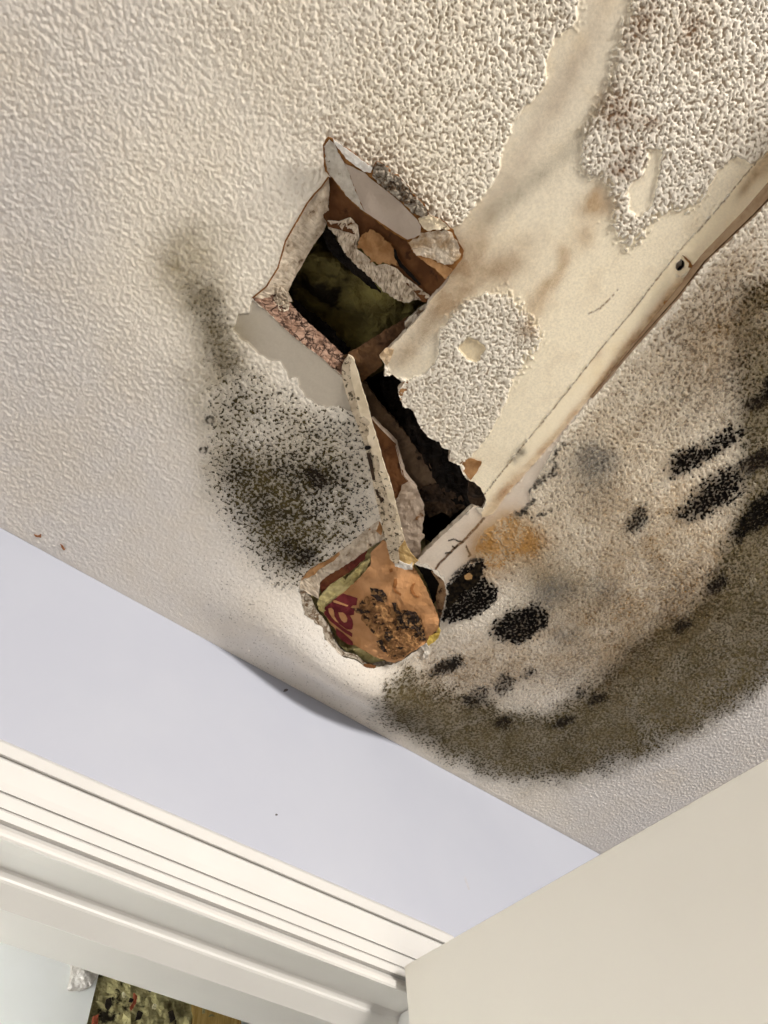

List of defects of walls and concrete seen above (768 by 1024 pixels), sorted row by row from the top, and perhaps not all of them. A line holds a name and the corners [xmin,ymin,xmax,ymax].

damp [171,263,374,590]
peeling [233,300,351,411]
peeling [419,371,616,584]
peeling [328,0,768,494]
damp [358,250,768,786]